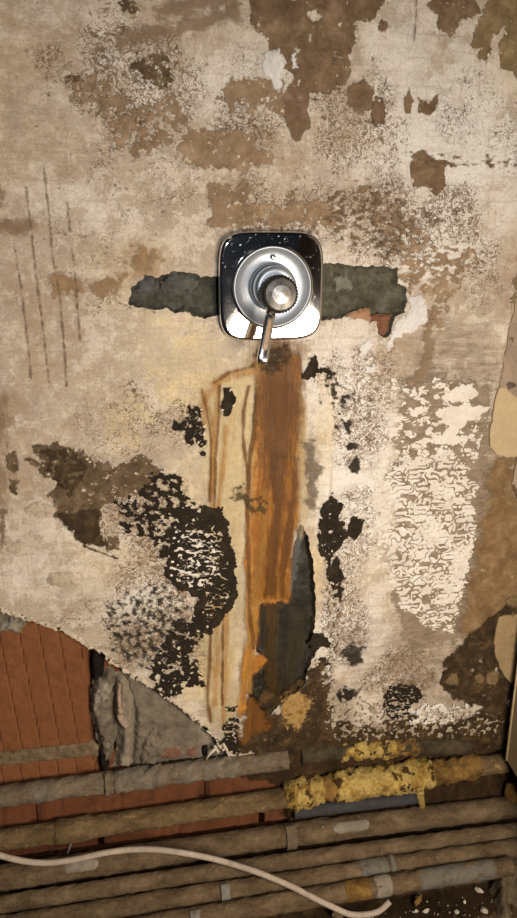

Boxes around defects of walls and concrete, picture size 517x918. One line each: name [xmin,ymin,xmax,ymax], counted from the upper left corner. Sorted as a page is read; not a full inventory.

peeling [427,0,517,78]
peeling [64,0,485,338]
peeling [401,150,517,196]
spalling [0,606,229,785]
damp [105,469,240,703]
damp [172,406,207,457]
rust [202,340,305,723]
damp [217,440,517,787]
spalling [246,525,500,741]
damp [282,769,513,822]